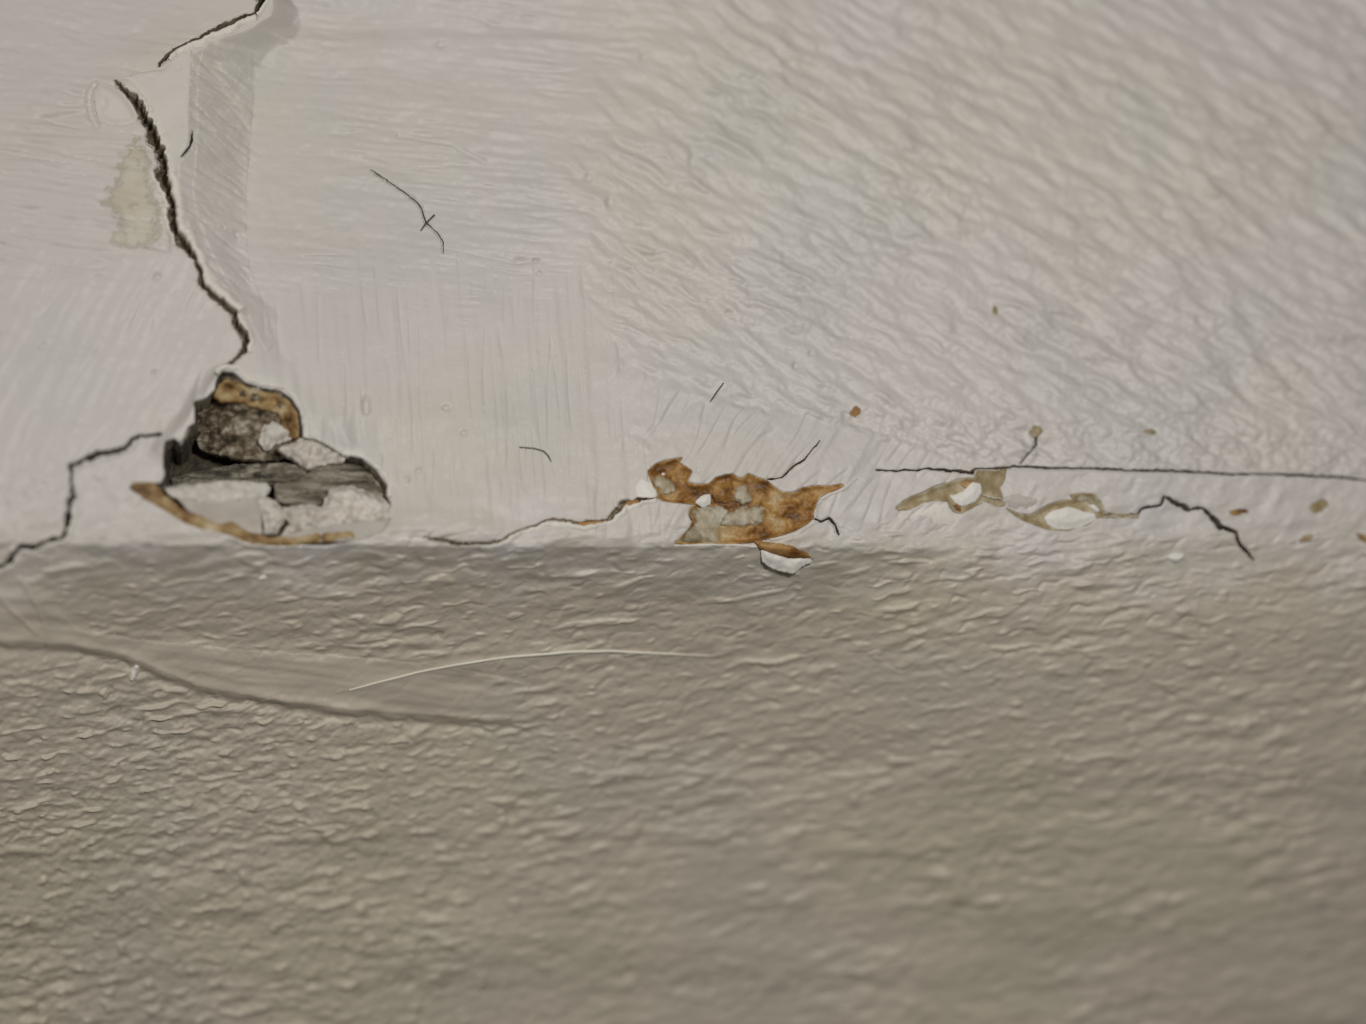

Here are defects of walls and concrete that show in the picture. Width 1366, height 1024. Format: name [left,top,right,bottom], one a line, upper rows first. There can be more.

crack [114,0,270,375]
crack [0,432,162,575]
spalling [130,364,428,550]
crack [424,497,656,553]
peeling [623,457,857,574]
peeling [896,468,1139,531]
crack [876,436,1366,562]